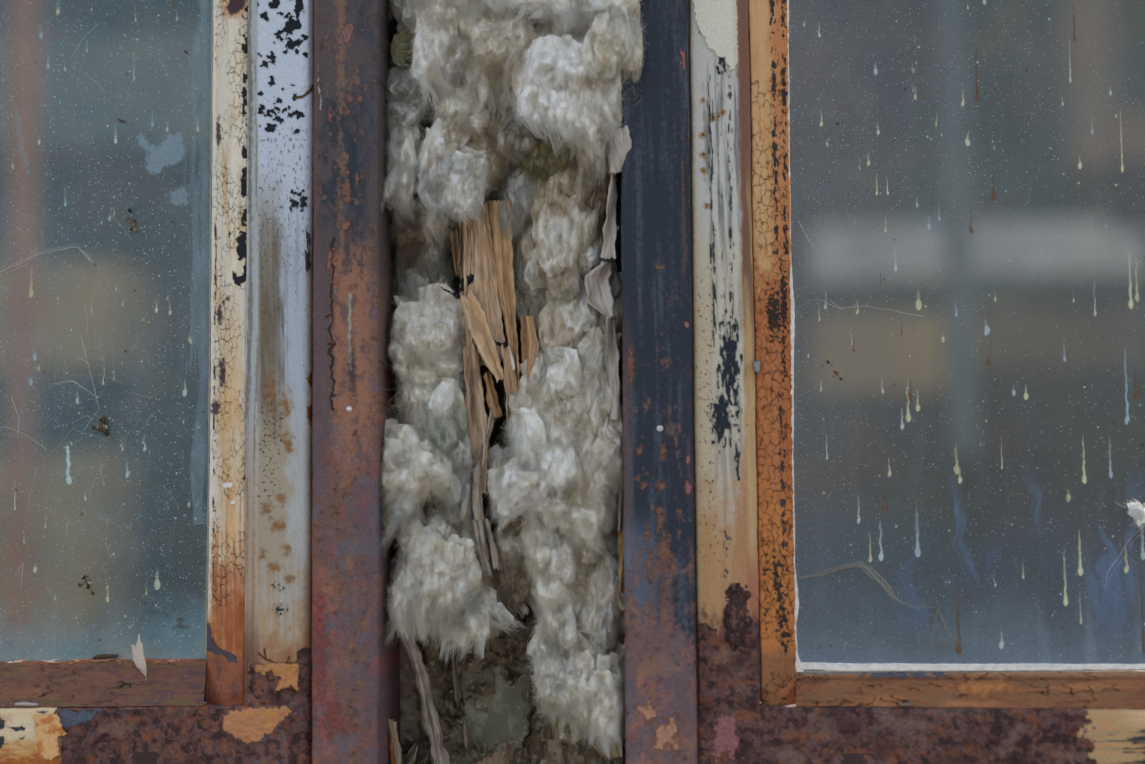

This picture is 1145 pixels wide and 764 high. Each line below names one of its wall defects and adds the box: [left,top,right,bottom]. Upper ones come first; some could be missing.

peeling [241,0,363,134]
peeling [692,0,739,211]
peeling [289,189,307,212]
crack [212,6,336,607]
peeling [706,225,748,481]
crack [751,80,796,643]
rust [644,507,671,581]
peeling [0,709,102,760]
rust [0,708,246,764]
rust [636,700,681,751]
rust [697,622,1096,764]
crack [763,671,1118,708]